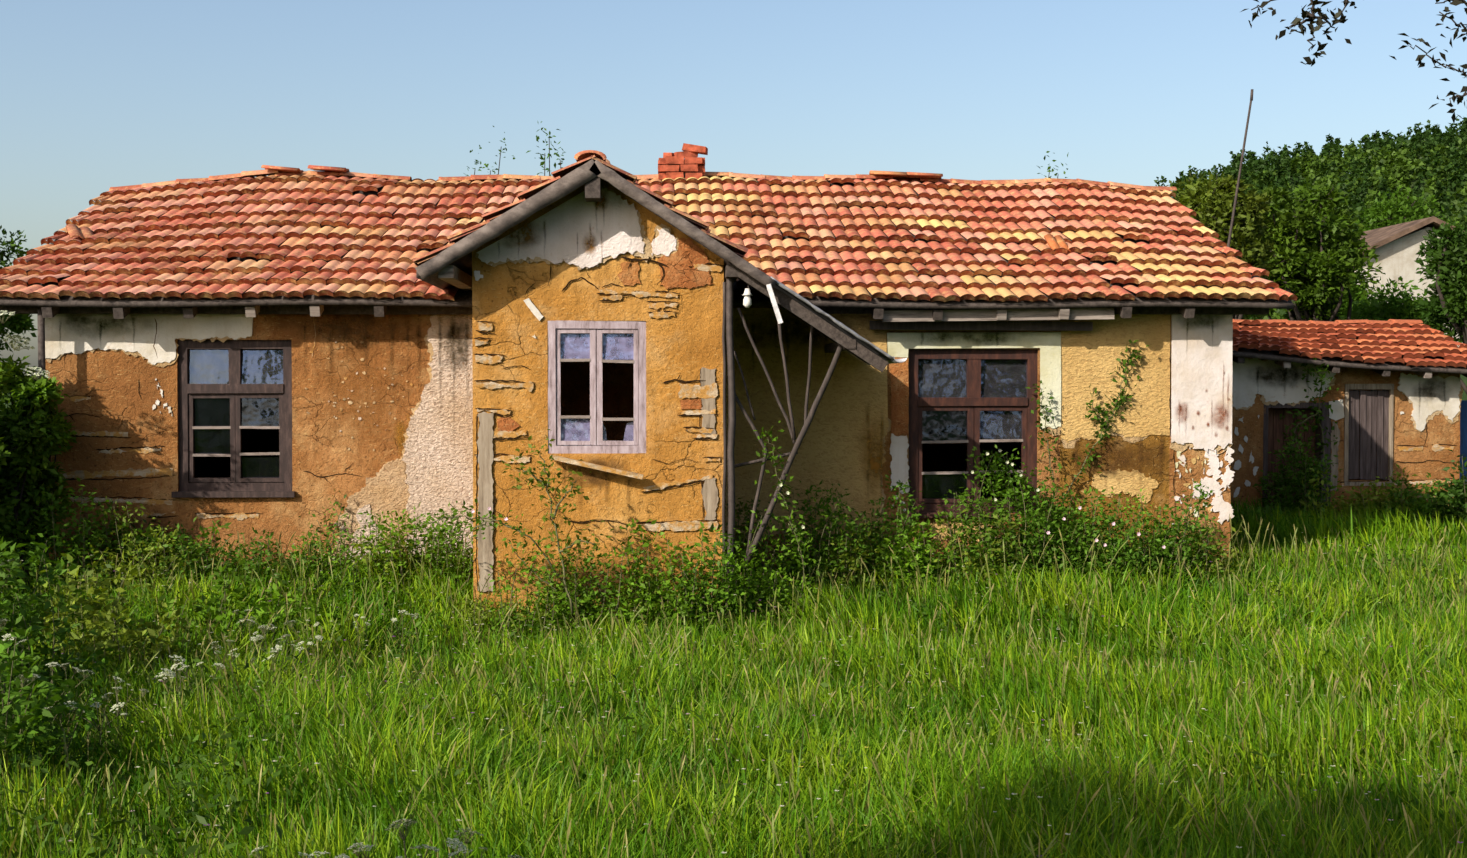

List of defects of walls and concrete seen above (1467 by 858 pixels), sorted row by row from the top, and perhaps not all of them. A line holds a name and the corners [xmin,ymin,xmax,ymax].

flaking render [523,298,544,338]
flaking render [474,186,712,289]
crack [524,256,668,297]
spalling [45,314,431,578]
spalling [680,399,702,409]
flaking render [725,314,1464,573]